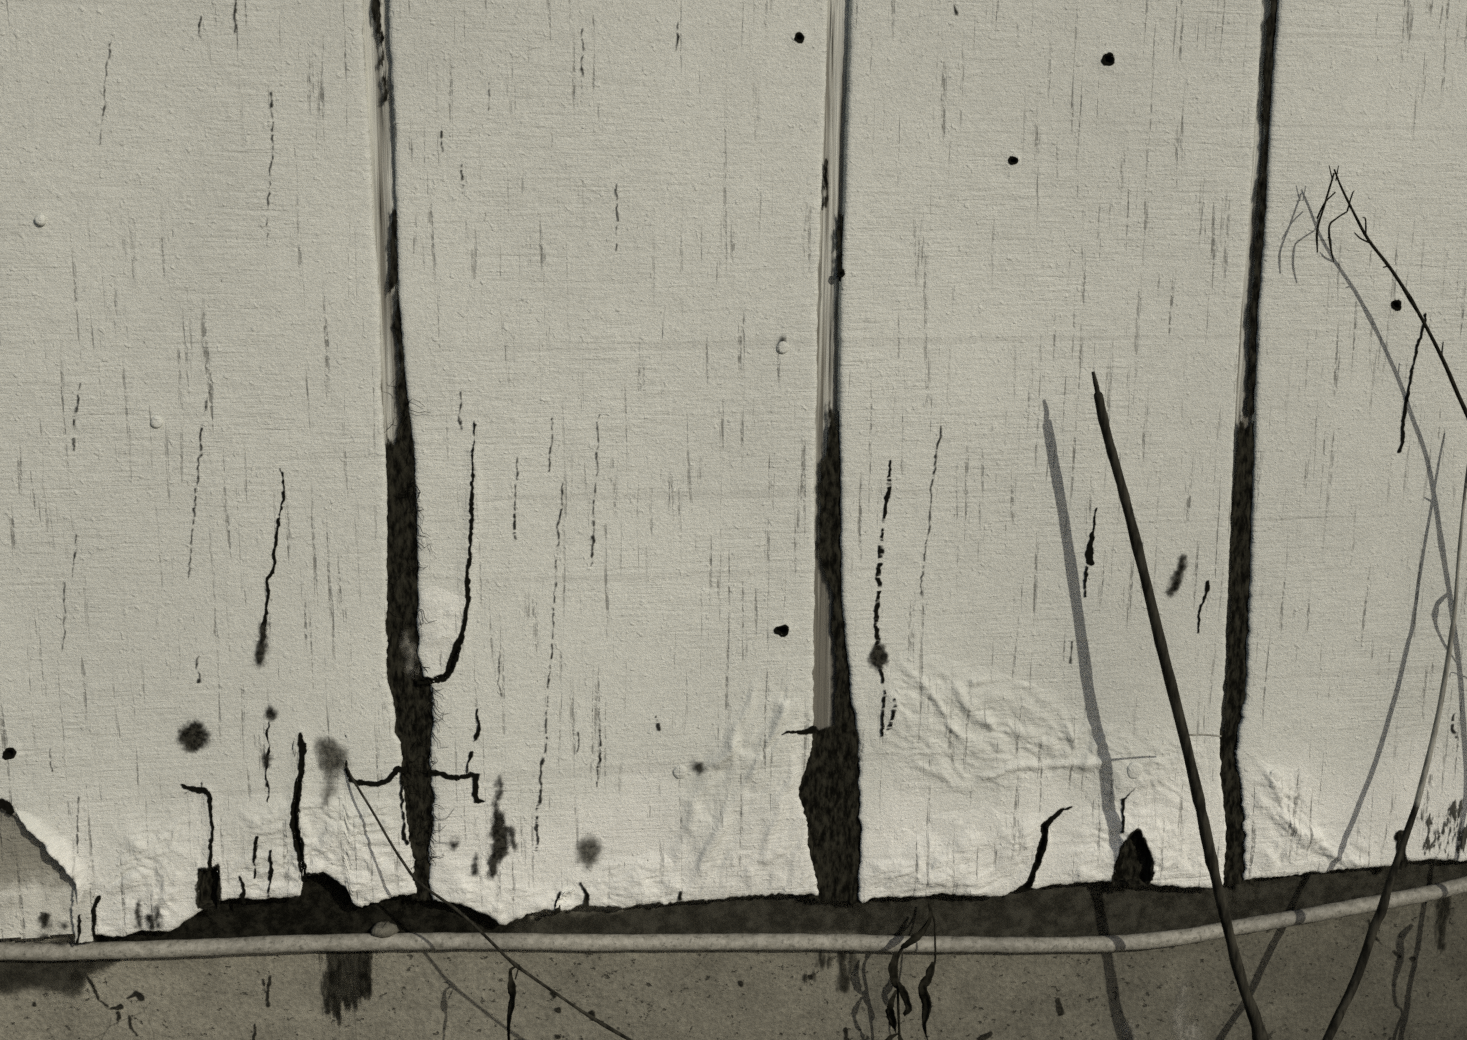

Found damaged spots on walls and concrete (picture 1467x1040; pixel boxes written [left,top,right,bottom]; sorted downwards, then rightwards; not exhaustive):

leakage [371,0,389,103]
leakage [822,158,844,278]
crack [255,468,286,665]
crack [417,392,477,685]
crack [513,416,602,851]
leakage [93,208,1221,942]
leakage [1219,0,1467,920]
peeling [0,799,101,945]
crack [181,707,324,904]
crack [345,658,502,845]
crack [1020,806,1073,892]
leakage [329,959,372,1028]